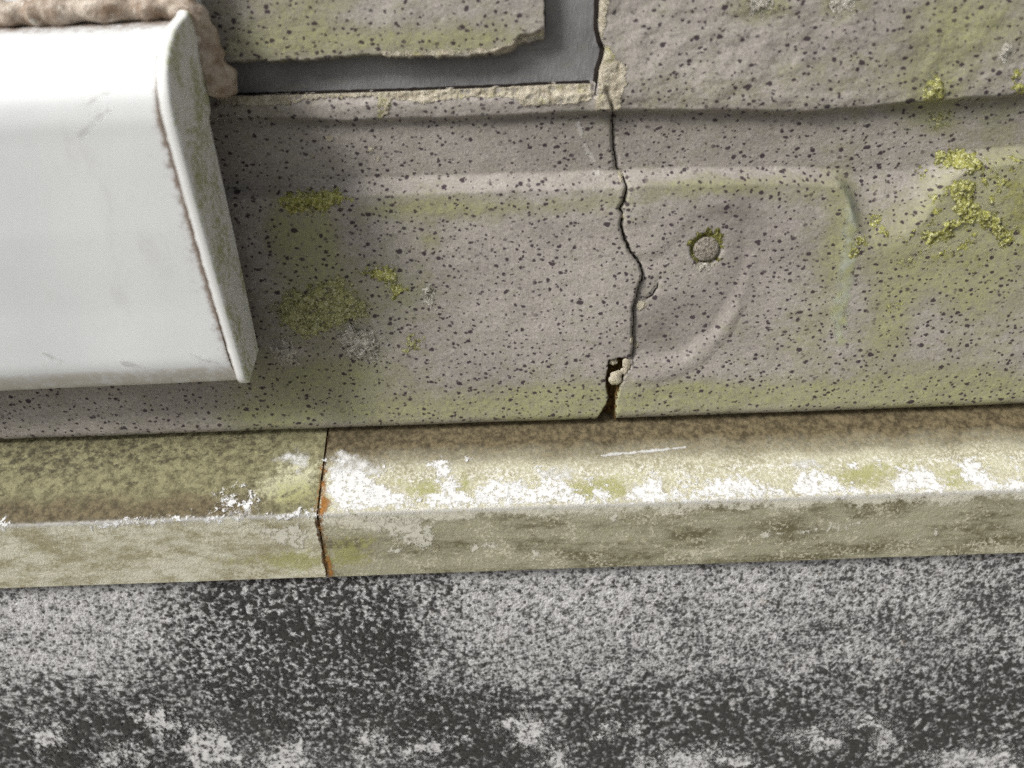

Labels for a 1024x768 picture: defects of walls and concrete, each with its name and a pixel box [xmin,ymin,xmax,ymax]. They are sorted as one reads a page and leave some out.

crack [593,0,658,355]
leakage [601,446,686,457]
rust [315,457,334,577]